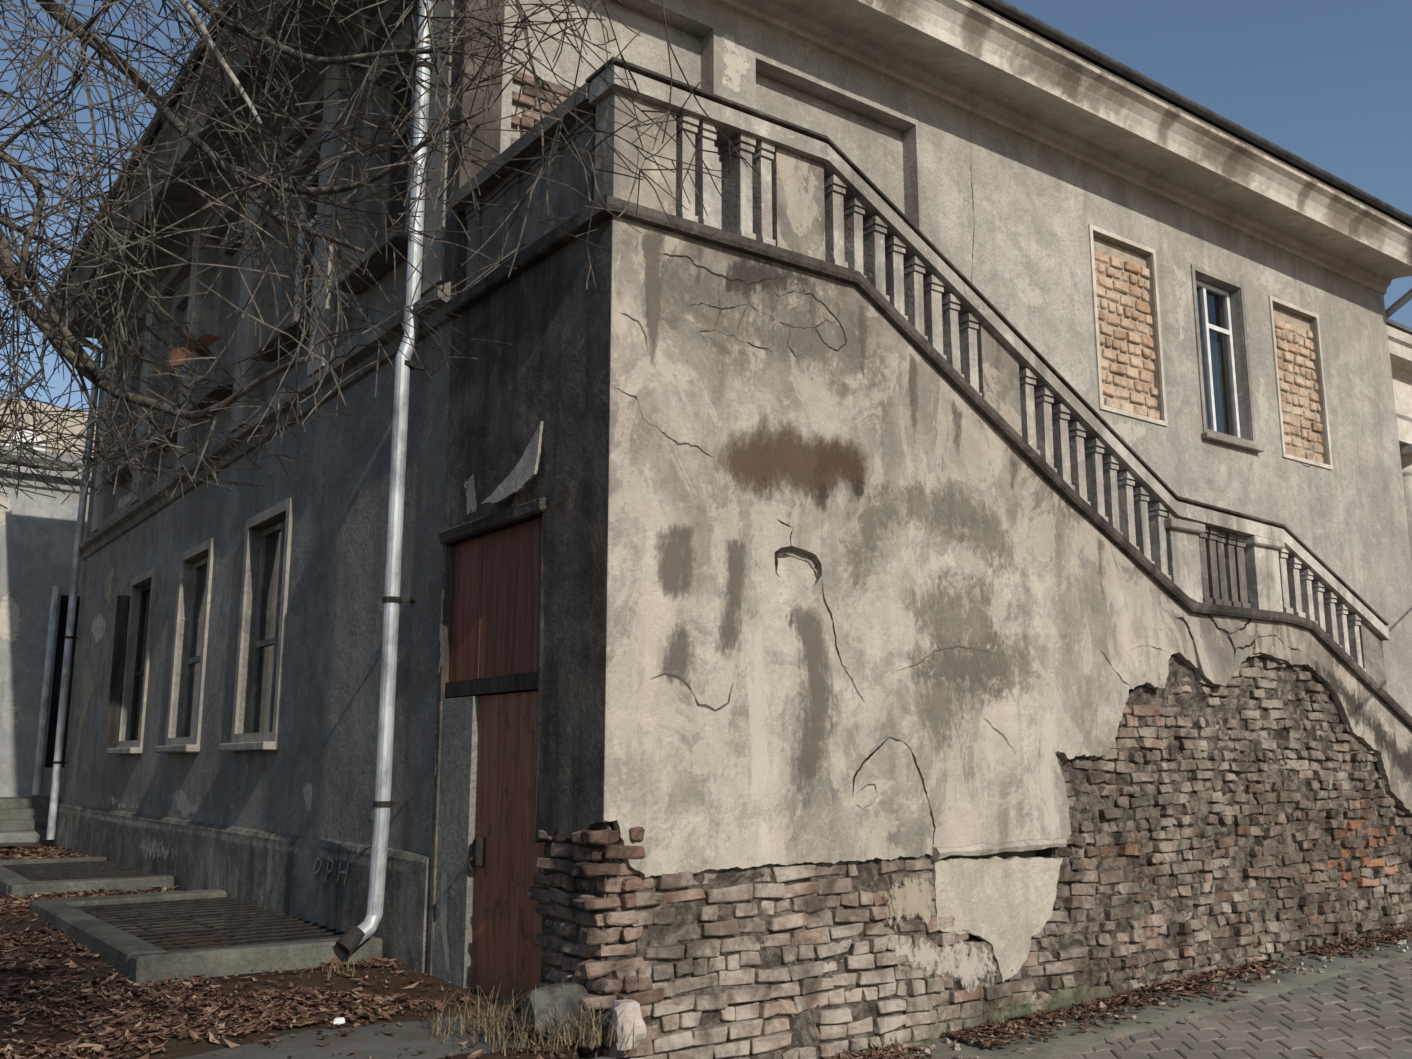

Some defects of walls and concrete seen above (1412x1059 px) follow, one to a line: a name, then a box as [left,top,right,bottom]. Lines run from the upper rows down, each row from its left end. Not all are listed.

damp [964,5,992,57]
damp [1011,45,1128,113]
peeling [464,421,544,515]
peeling [0,592,24,642]
damp [658,527,693,596]
damp [631,540,771,804]
spalling [774,519,822,604]
damp [790,608,837,788]
crack [822,582,865,702]
damp [849,482,1030,746]
crack [853,736,936,845]
spalling [523,614,1412,1059]